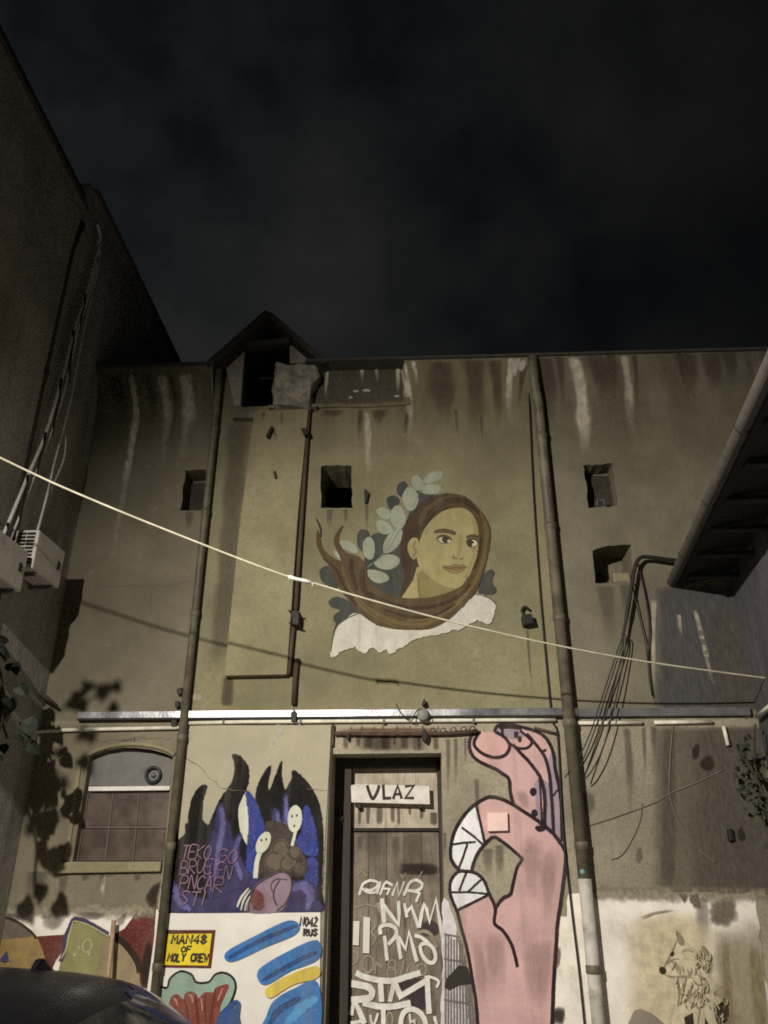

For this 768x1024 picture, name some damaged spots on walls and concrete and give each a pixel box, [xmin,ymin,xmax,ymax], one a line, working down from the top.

damp [111,375,194,476]
damp [315,361,417,456]
damp [467,359,526,402]
damp [540,355,637,436]
crack [82,735,250,791]
corrosion [331,725,477,748]
spalling [679,894,735,925]